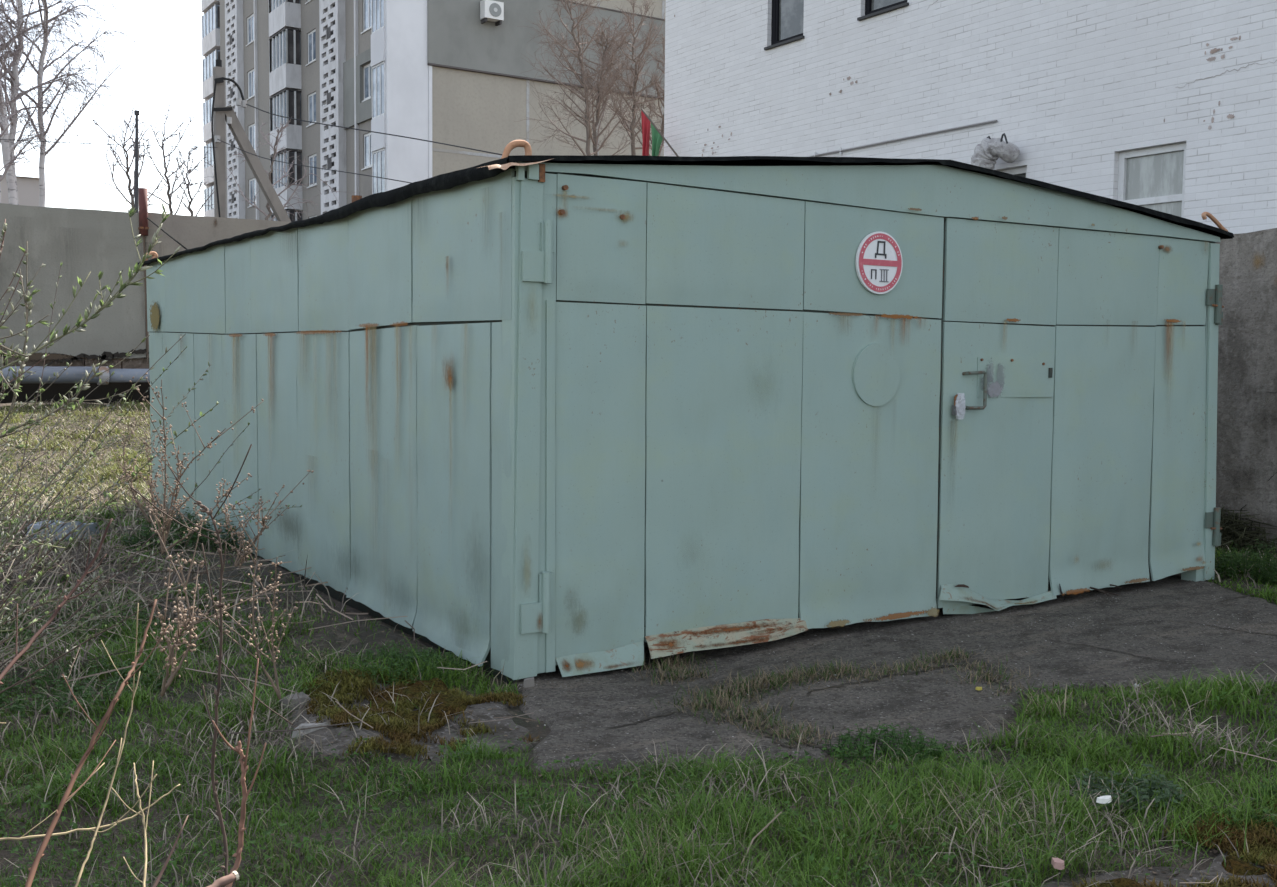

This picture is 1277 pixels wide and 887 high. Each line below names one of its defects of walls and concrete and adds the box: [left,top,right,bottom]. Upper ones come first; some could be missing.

rust [693,624,780,647]
rust [563,660,589,670]